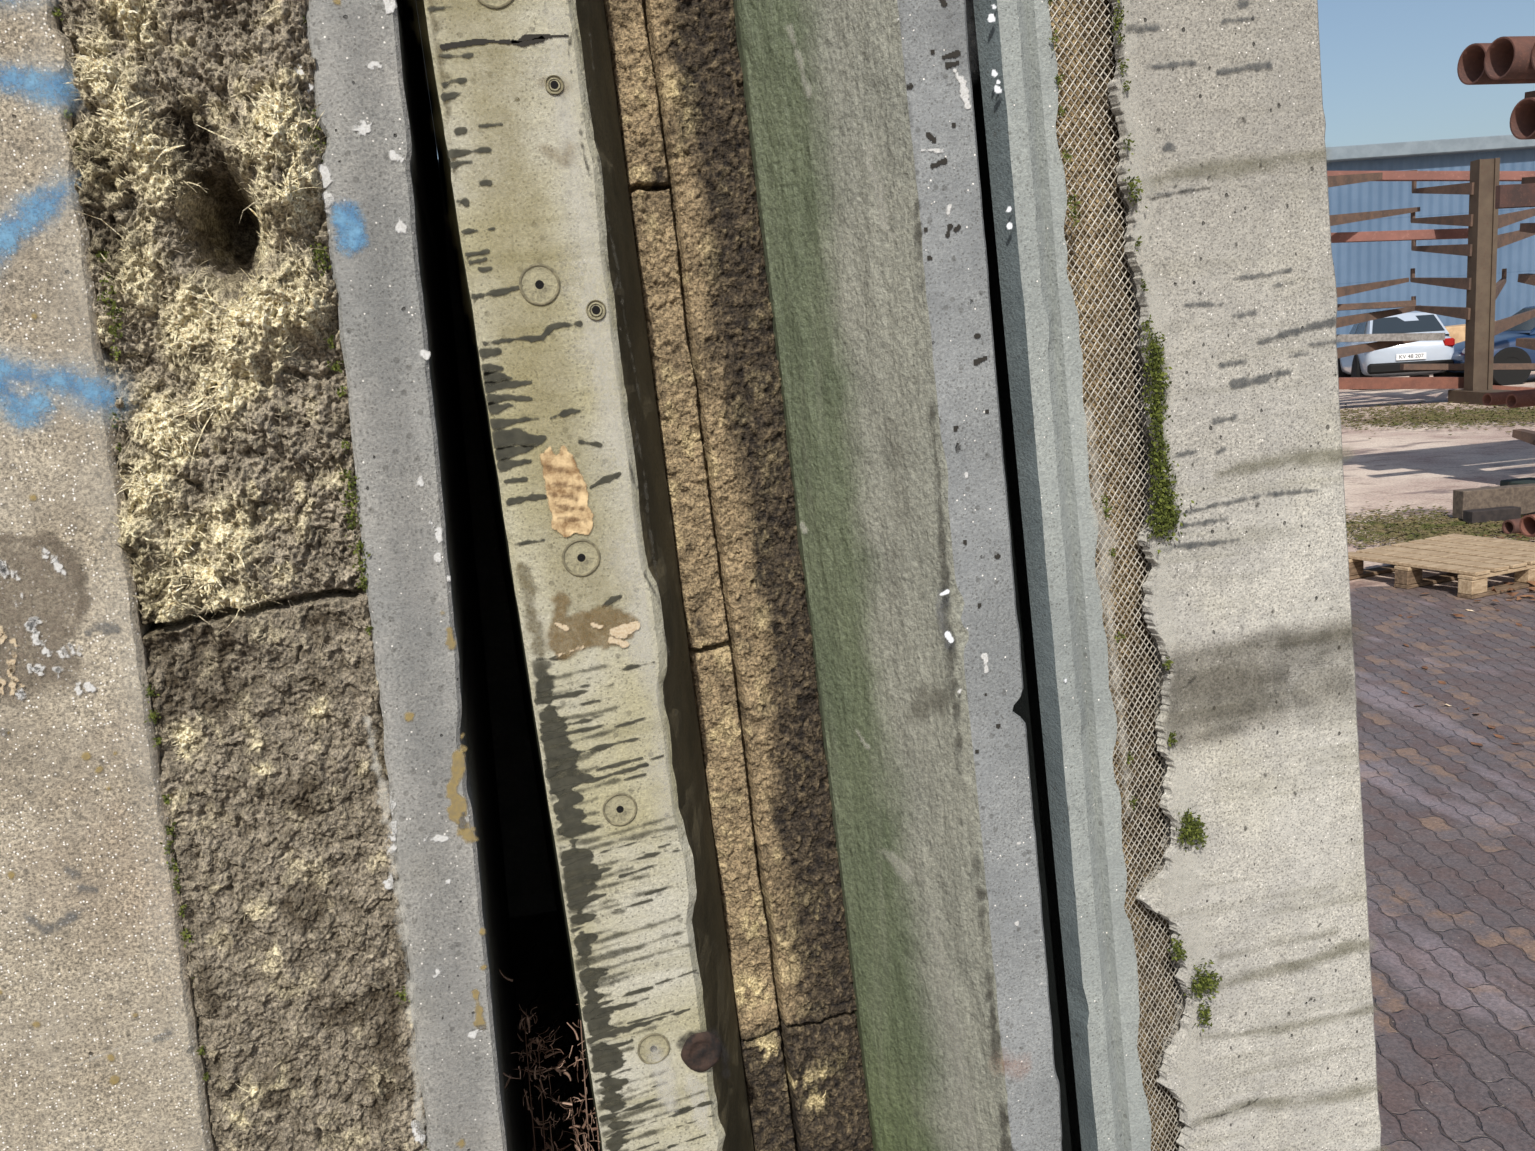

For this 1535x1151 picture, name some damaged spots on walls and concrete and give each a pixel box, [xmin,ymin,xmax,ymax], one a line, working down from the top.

peeling [549,594,640,659]
damp [533,649,714,1151]
rust [679,1032,729,1118]